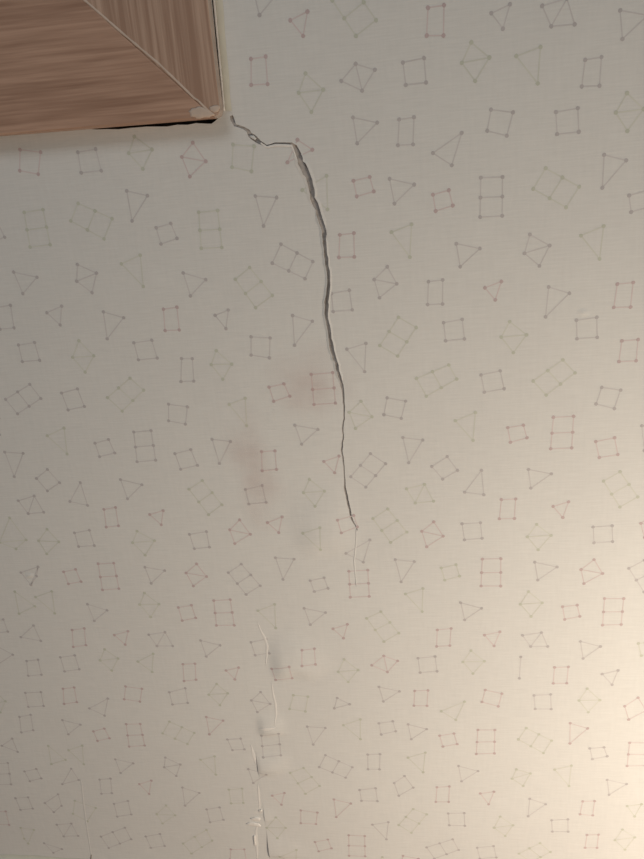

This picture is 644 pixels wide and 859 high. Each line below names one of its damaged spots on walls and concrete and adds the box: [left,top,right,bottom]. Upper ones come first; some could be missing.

crack [230,115,358,580]